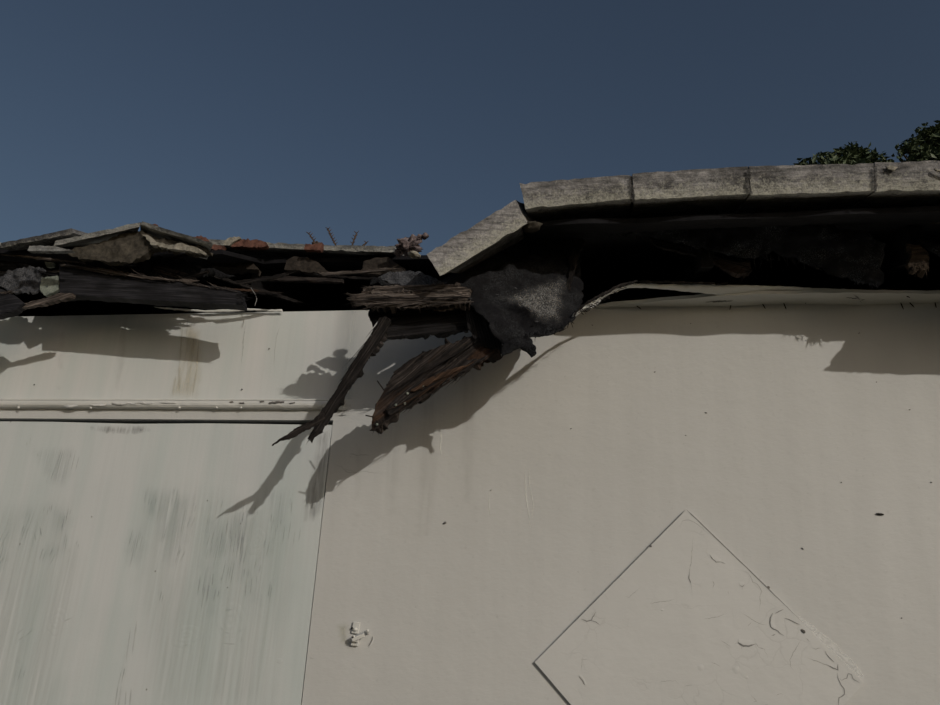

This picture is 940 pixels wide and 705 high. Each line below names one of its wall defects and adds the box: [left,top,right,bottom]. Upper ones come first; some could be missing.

crack [686,509,800,647]
crack [817,648,860,705]